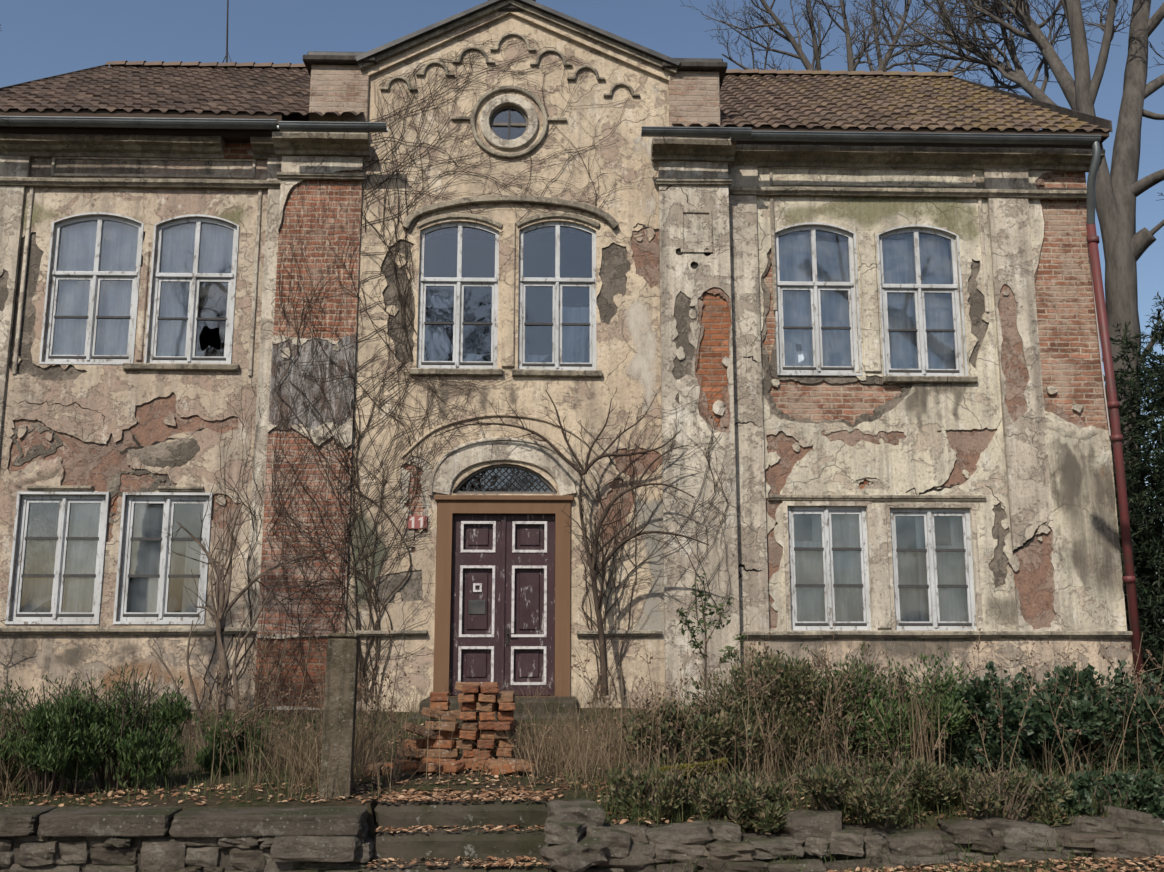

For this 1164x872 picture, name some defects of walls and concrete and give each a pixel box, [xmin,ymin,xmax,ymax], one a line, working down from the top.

spalling [0,233,87,382]
spalling [381,240,415,363]
spalling [596,227,660,325]
flaking render [672,287,732,434]
flaking render [967,171,1108,430]
spalling [8,393,238,542]
flaking render [254,171,363,708]
flaking render [761,248,914,629]
spalling [928,428,997,490]
spalling [989,501,1055,630]